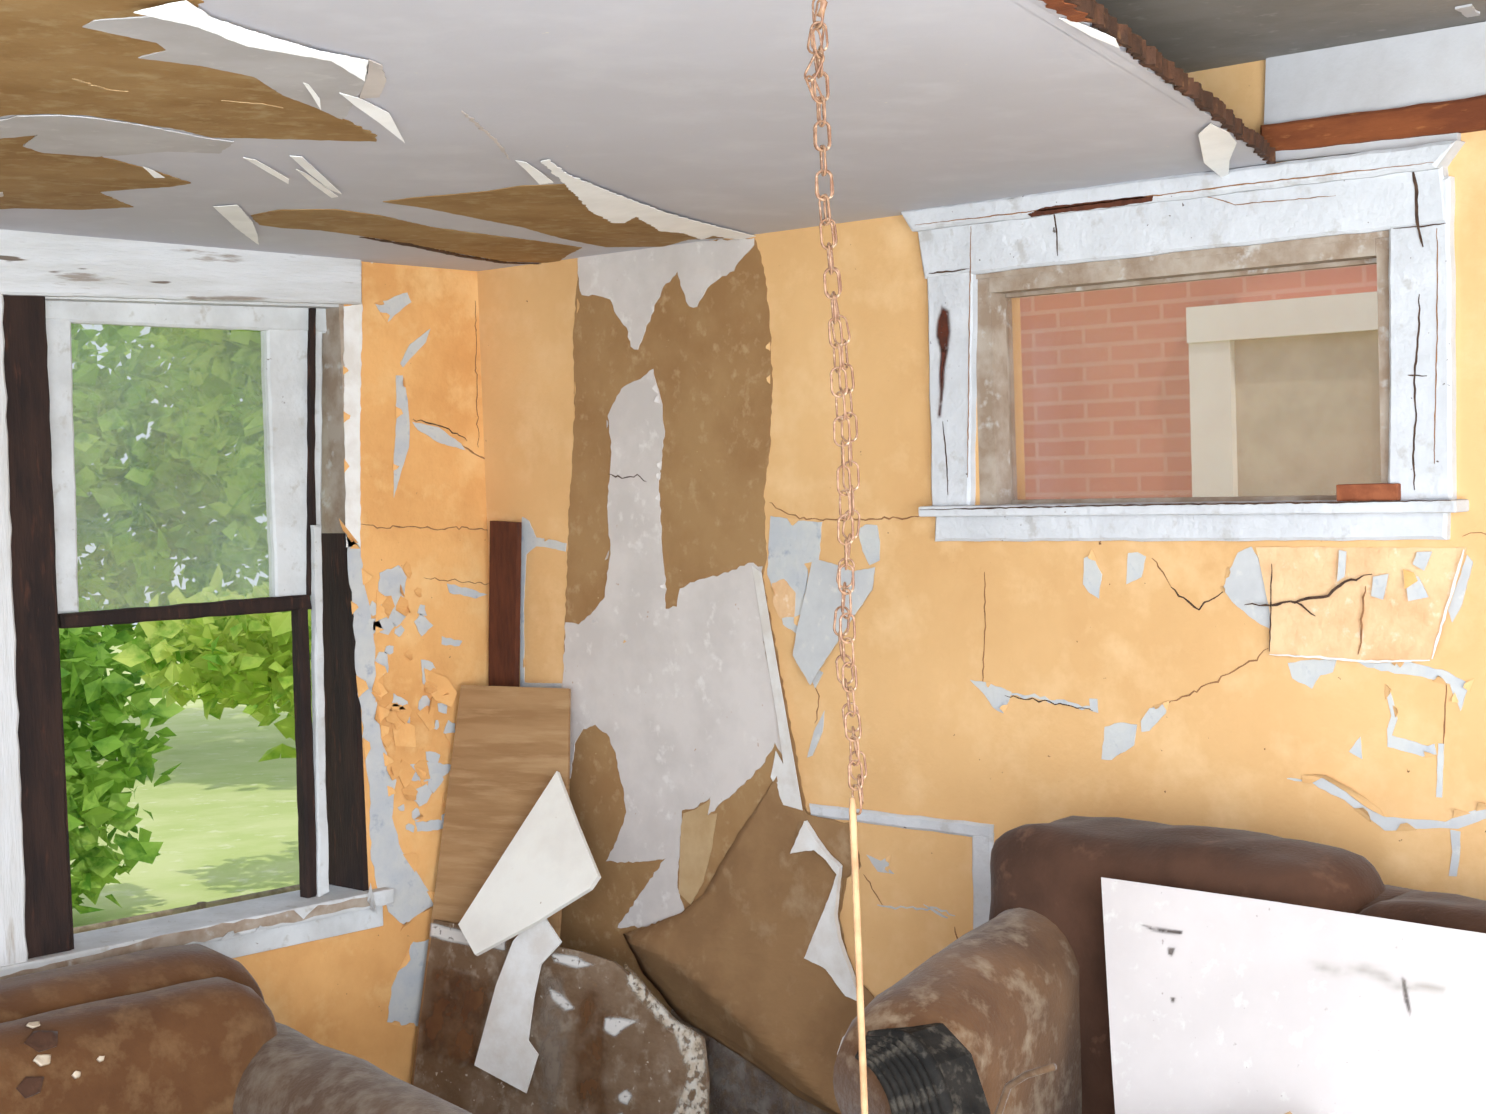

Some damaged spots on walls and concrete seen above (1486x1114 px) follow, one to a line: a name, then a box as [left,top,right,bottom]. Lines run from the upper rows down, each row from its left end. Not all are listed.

peeling [0,115,341,198]
peeling [213,205,259,245]
flaking render [578,238,754,350]
corrosion [937,308,950,416]
peeling [0,293,462,1027]
peeling [447,584,487,599]
flaking render [520,369,919,928]
peeling [1083,549,1102,598]
crack [1152,558,1372,654]
peeling [1102,532,1486,876]